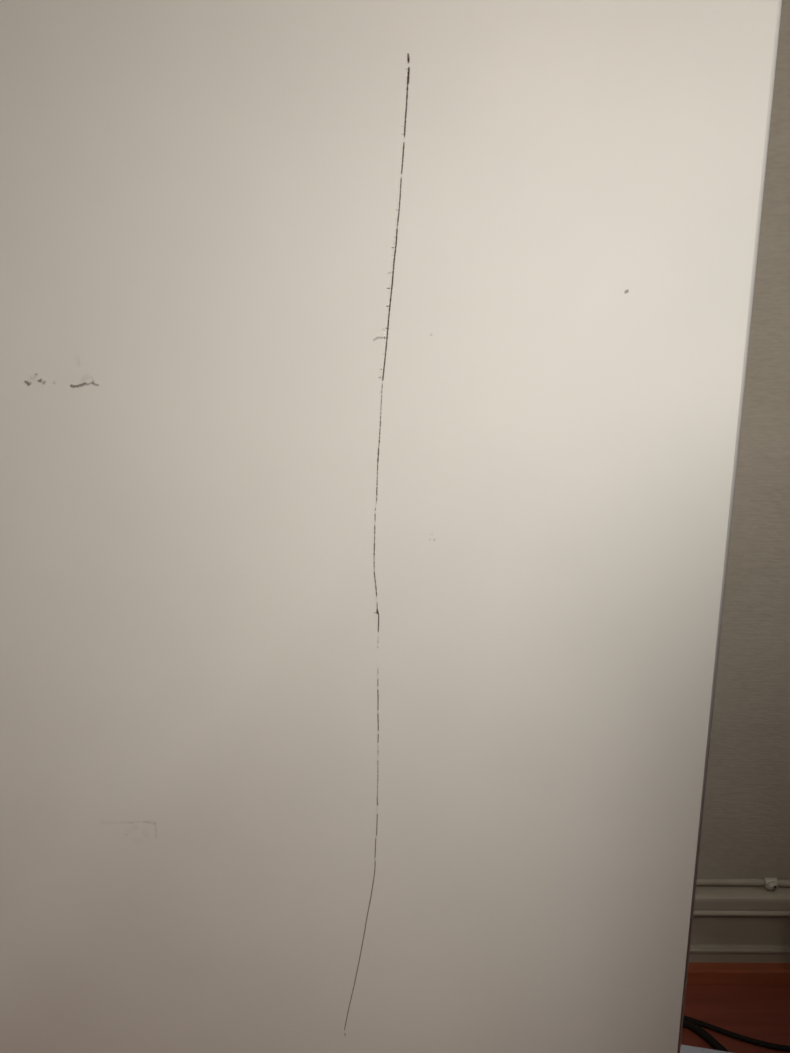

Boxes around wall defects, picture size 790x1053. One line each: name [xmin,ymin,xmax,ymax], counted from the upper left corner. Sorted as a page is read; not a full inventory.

crack [374,53,410,632]